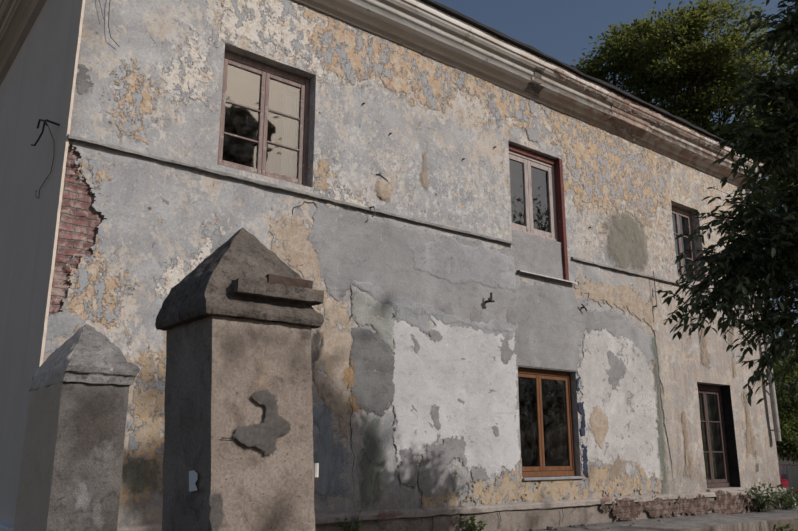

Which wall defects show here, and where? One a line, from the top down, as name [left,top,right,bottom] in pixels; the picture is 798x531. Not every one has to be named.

peeling [101,0,675,234]
flaking render [44,144,225,353]
peeling [119,331,166,505]
crack [347,356,355,501]
peeling [430,404,441,430]
peeling [395,435,771,521]
peeling [589,405,609,449]
peeling [607,351,627,390]